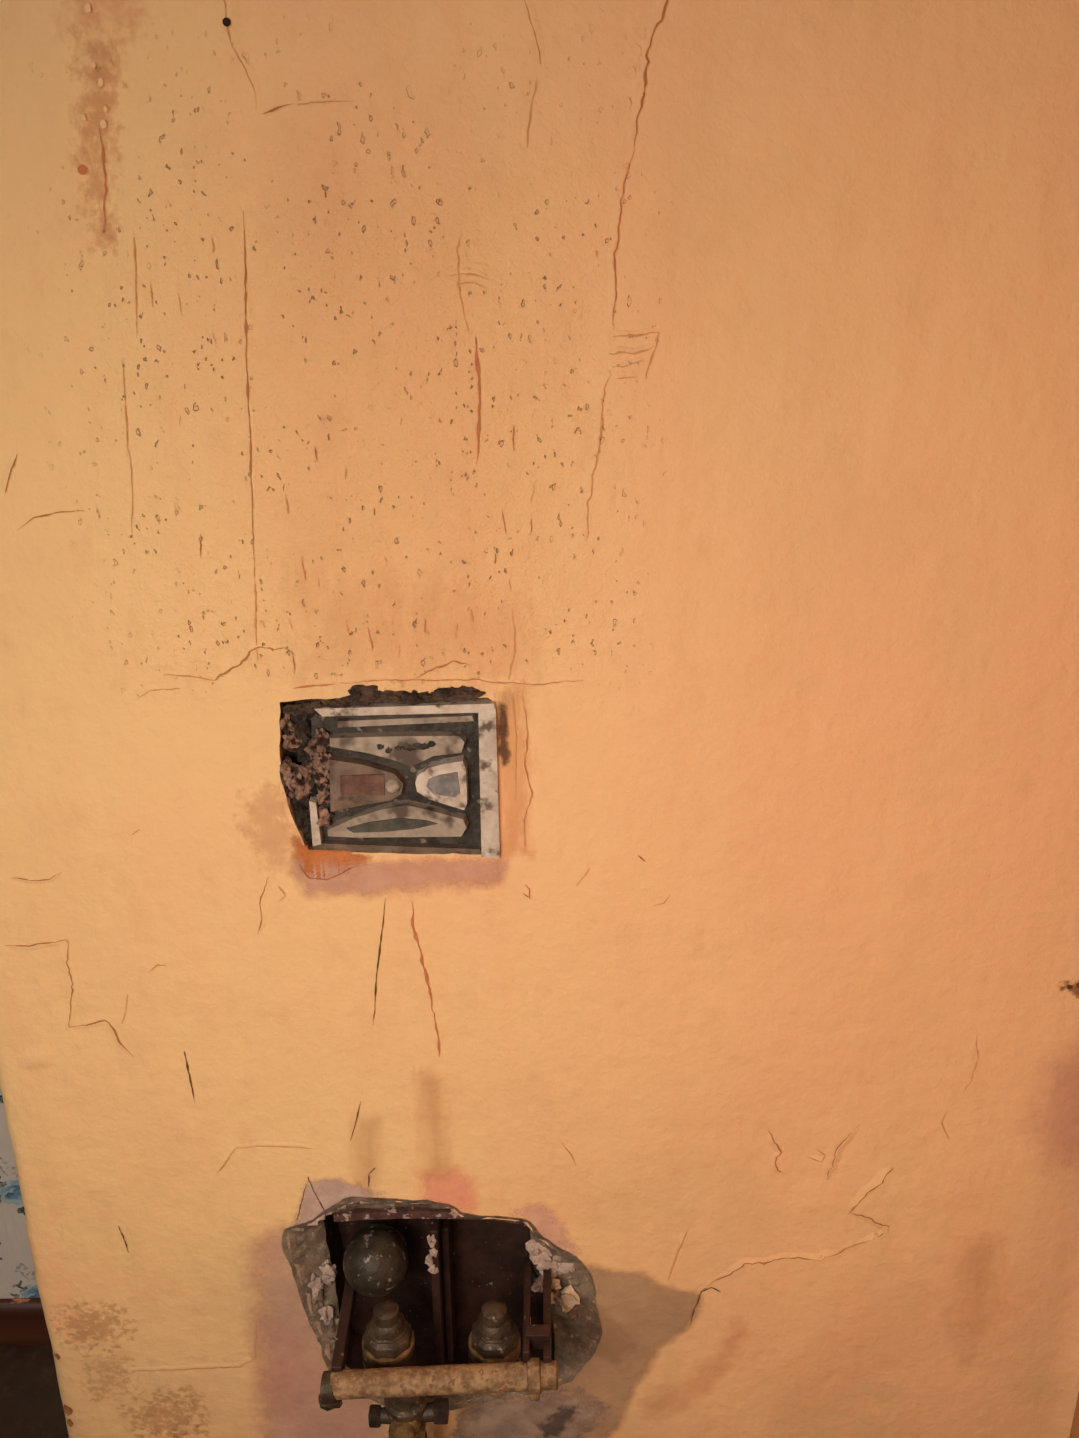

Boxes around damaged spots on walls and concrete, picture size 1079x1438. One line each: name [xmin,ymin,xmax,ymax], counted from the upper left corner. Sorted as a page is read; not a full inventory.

crack [223,0,351,114]
crack [579,0,668,541]
crack [139,212,583,899]
spalling [279,714,335,827]
corrosion [293,839,366,880]
crack [6,939,166,1057]
crack [373,900,440,1055]
crack [690,1124,894,1325]
flaking render [255,1179,602,1438]